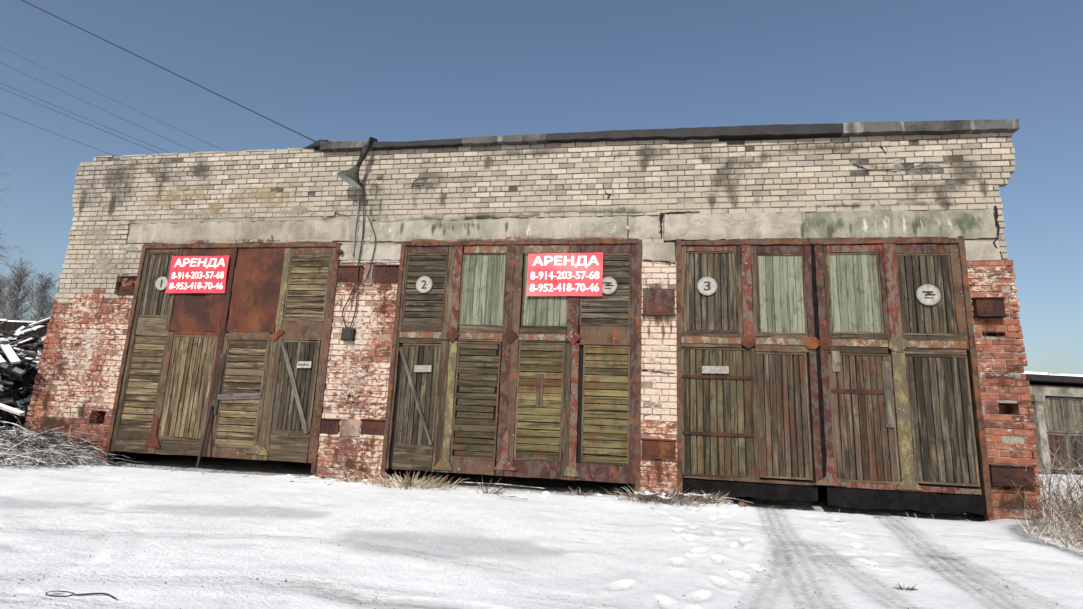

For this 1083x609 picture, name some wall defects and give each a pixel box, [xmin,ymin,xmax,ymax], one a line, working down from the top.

leakage [640,147,657,168]
leakage [106,173,128,214]
leakage [191,163,218,212]
crack [993,206,1003,258]
spalling [48,323,110,384]
peeling [325,292,396,417]
spalling [986,366,1025,414]
spalling [82,407,106,424]